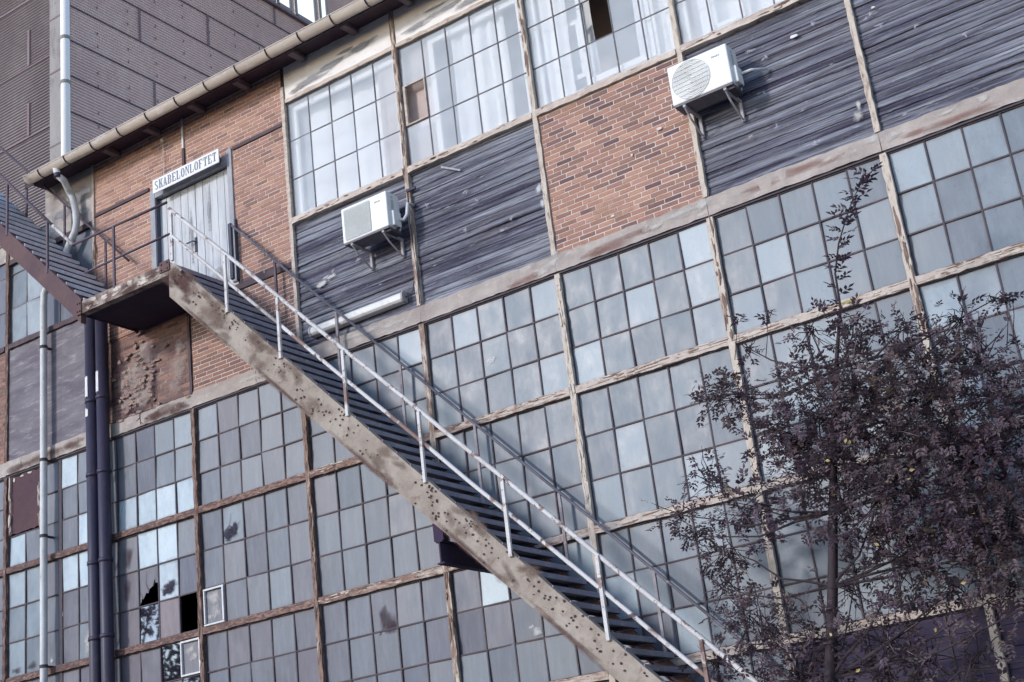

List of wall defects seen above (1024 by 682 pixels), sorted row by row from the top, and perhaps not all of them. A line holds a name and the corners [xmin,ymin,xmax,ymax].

spalling [111,332,168,426]